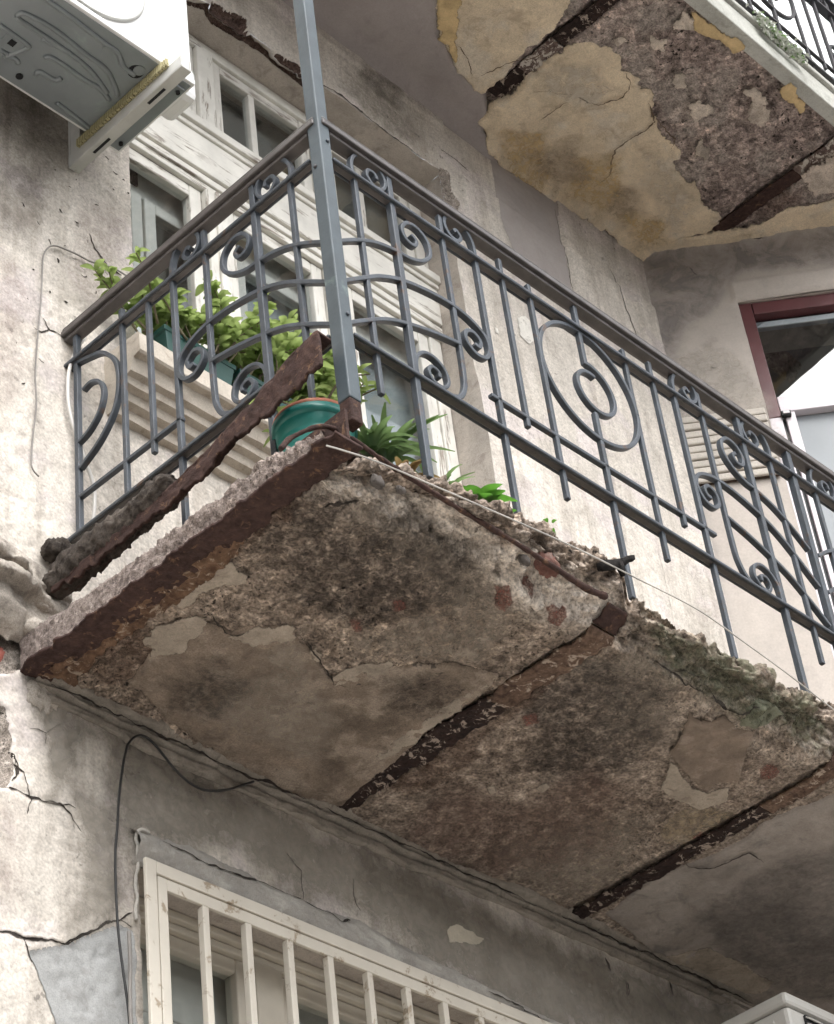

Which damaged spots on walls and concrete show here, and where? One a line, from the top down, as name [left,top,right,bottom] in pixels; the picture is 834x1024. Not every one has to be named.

crack [458,40,559,76]
crack [539,73,676,186]
spalling [438,167,460,210]
spalling [278,423,338,452]
spalling [350,435,608,600]
spalling [495,585,513,611]
spalling [544,603,567,626]
crack [0,705,81,831]
crack [0,912,132,961]
peeling [447,924,484,945]